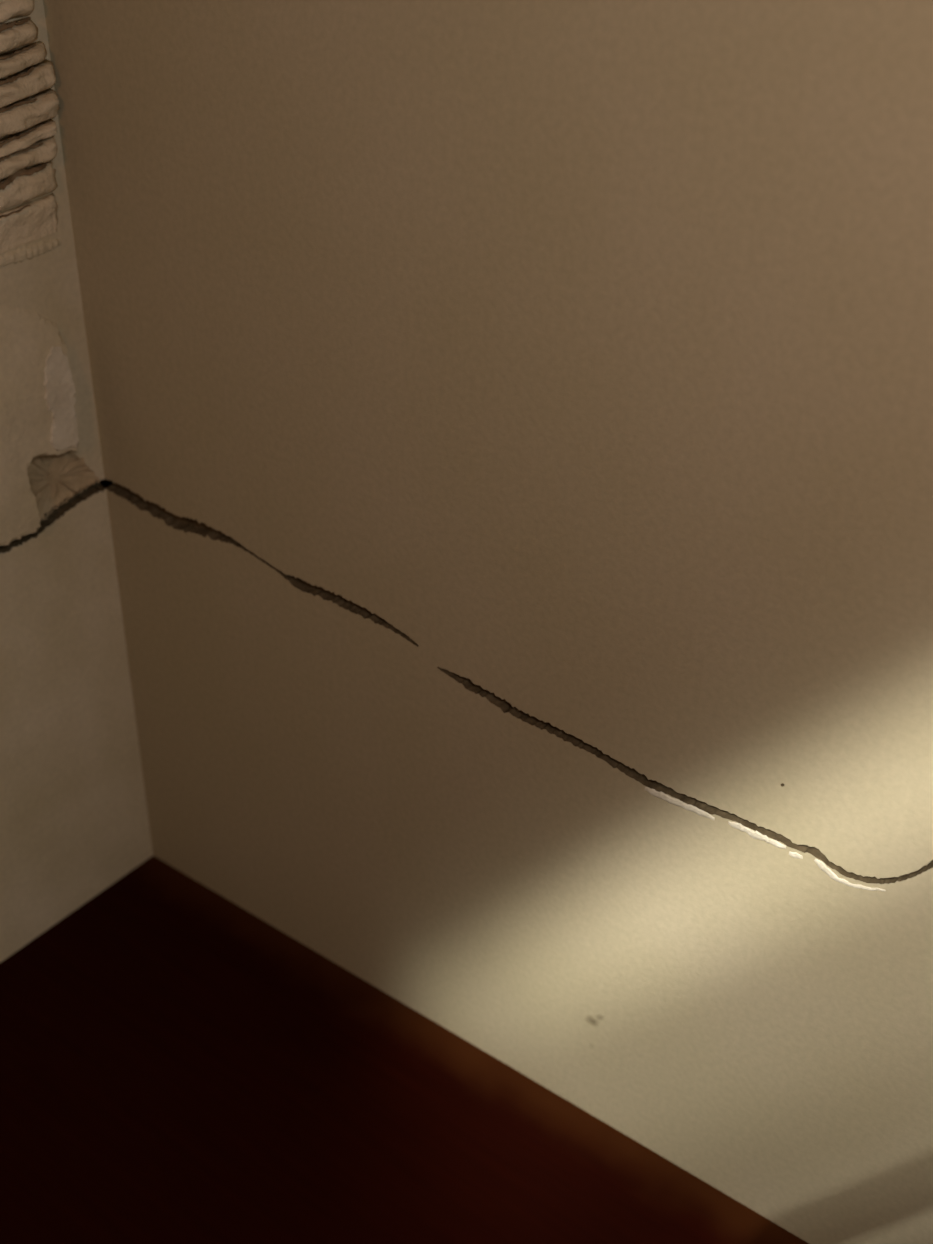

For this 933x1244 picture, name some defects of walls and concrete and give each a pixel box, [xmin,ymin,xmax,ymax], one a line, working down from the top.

crack [0,479,933,892]